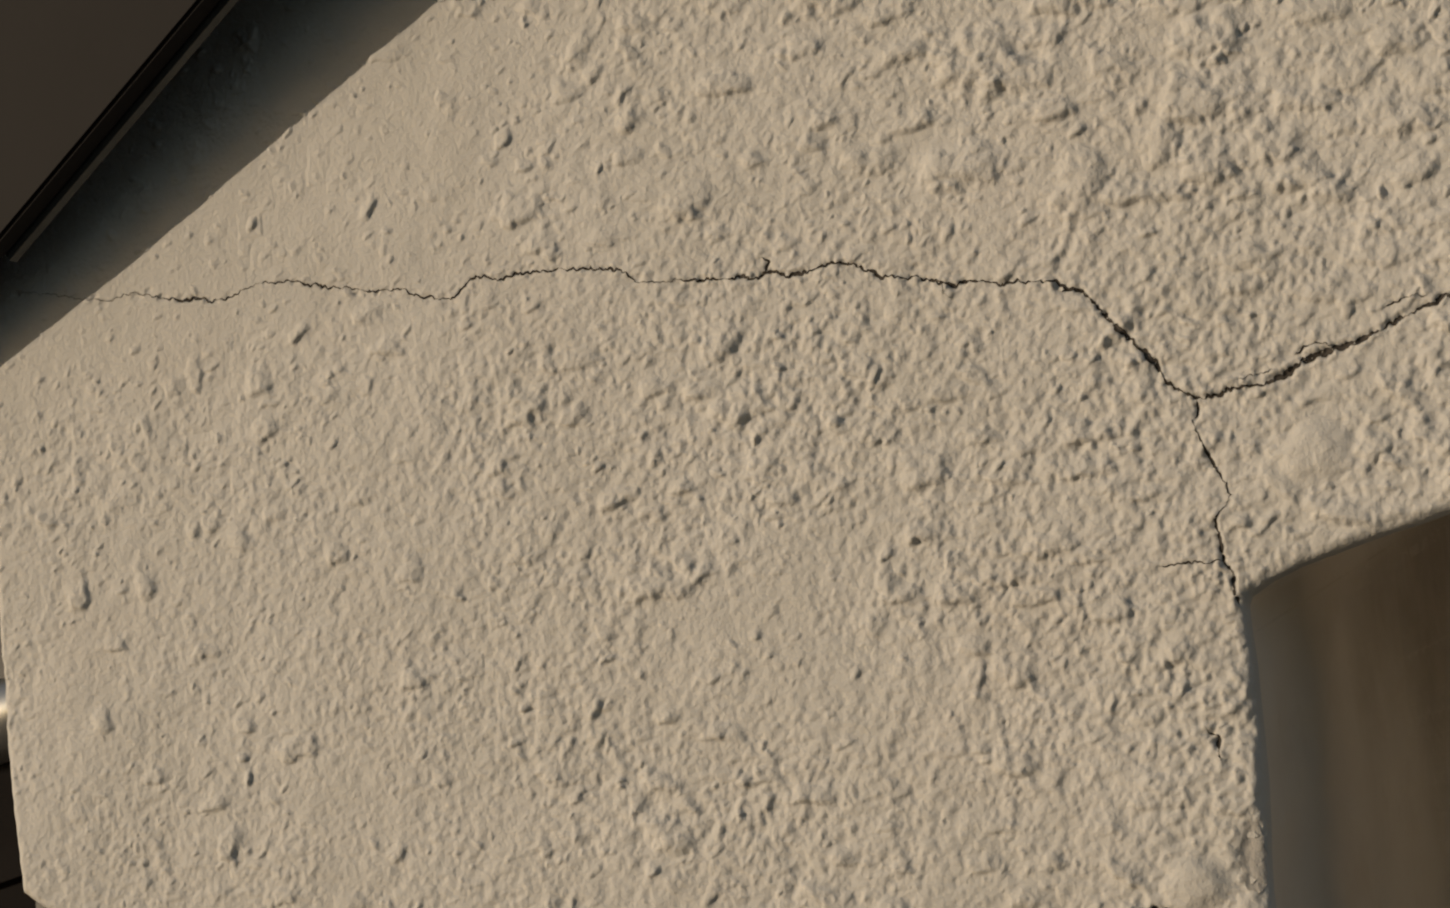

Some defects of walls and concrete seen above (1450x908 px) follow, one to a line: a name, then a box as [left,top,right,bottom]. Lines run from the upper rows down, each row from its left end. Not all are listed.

crack [17,257,1450,604]